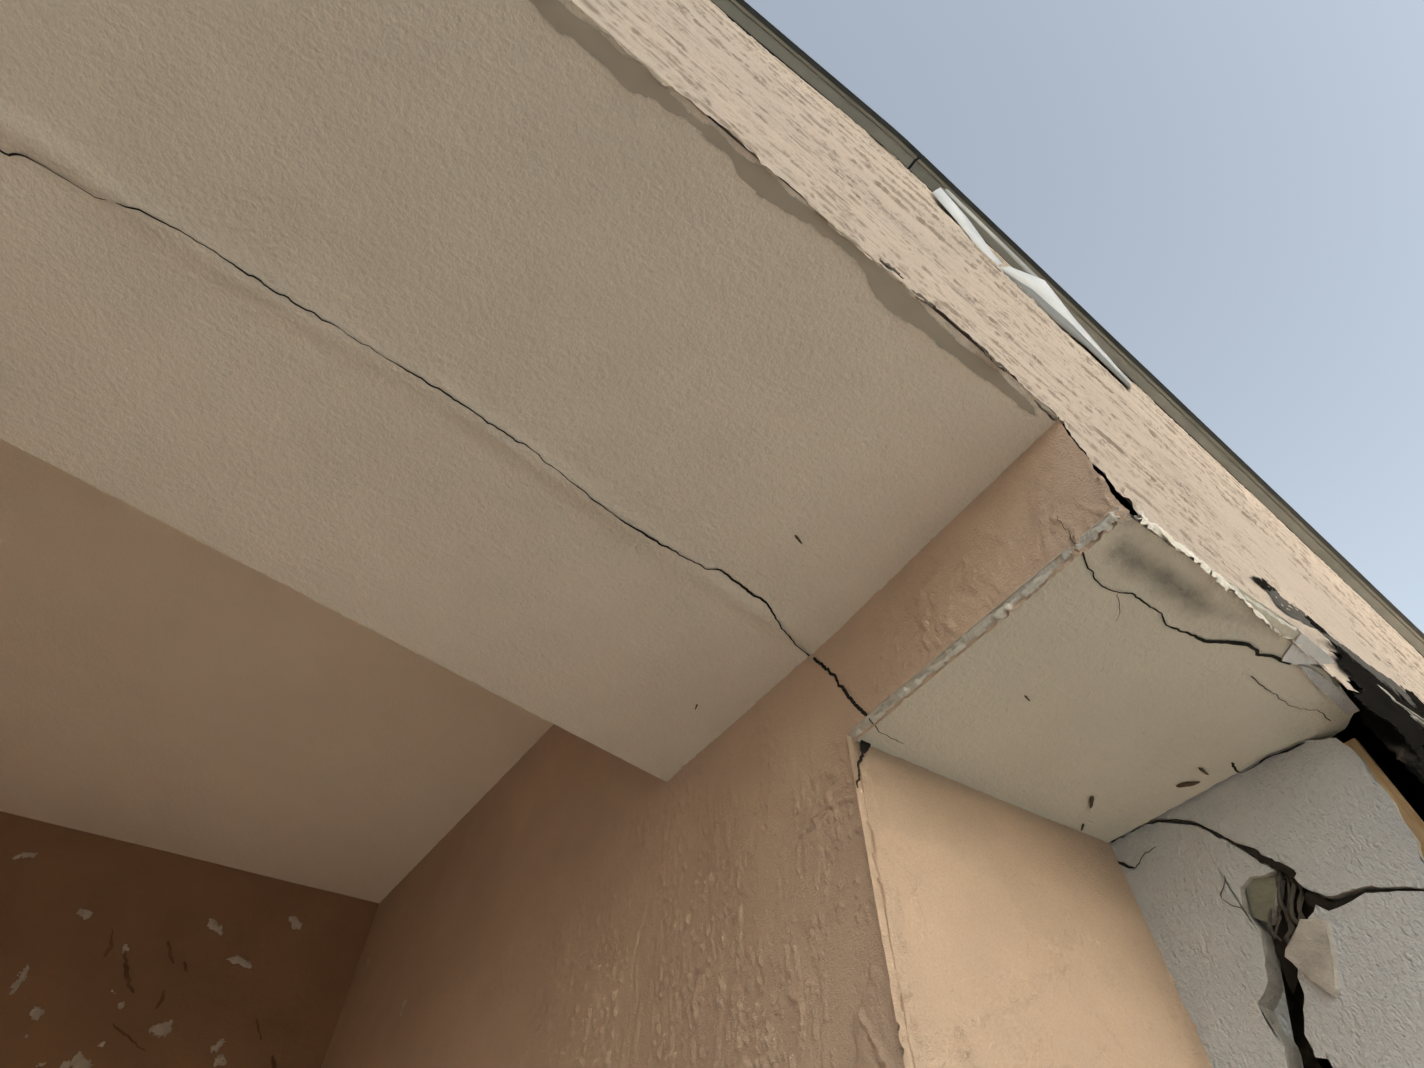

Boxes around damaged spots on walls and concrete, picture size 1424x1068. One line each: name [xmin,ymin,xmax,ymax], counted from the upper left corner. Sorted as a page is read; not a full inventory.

spalling [879,258,937,309]
spalling [974,340,1008,373]
crack [0,150,904,788]
mould [1250,575,1277,592]
crack [1057,516,1424,785]
mould [1305,615,1424,776]
crack [1118,819,1424,998]
peeling [227,955,252,969]
peeling [148,1020,173,1038]
peeling [36,1041,106,1068]
peeling [210,1038,227,1067]